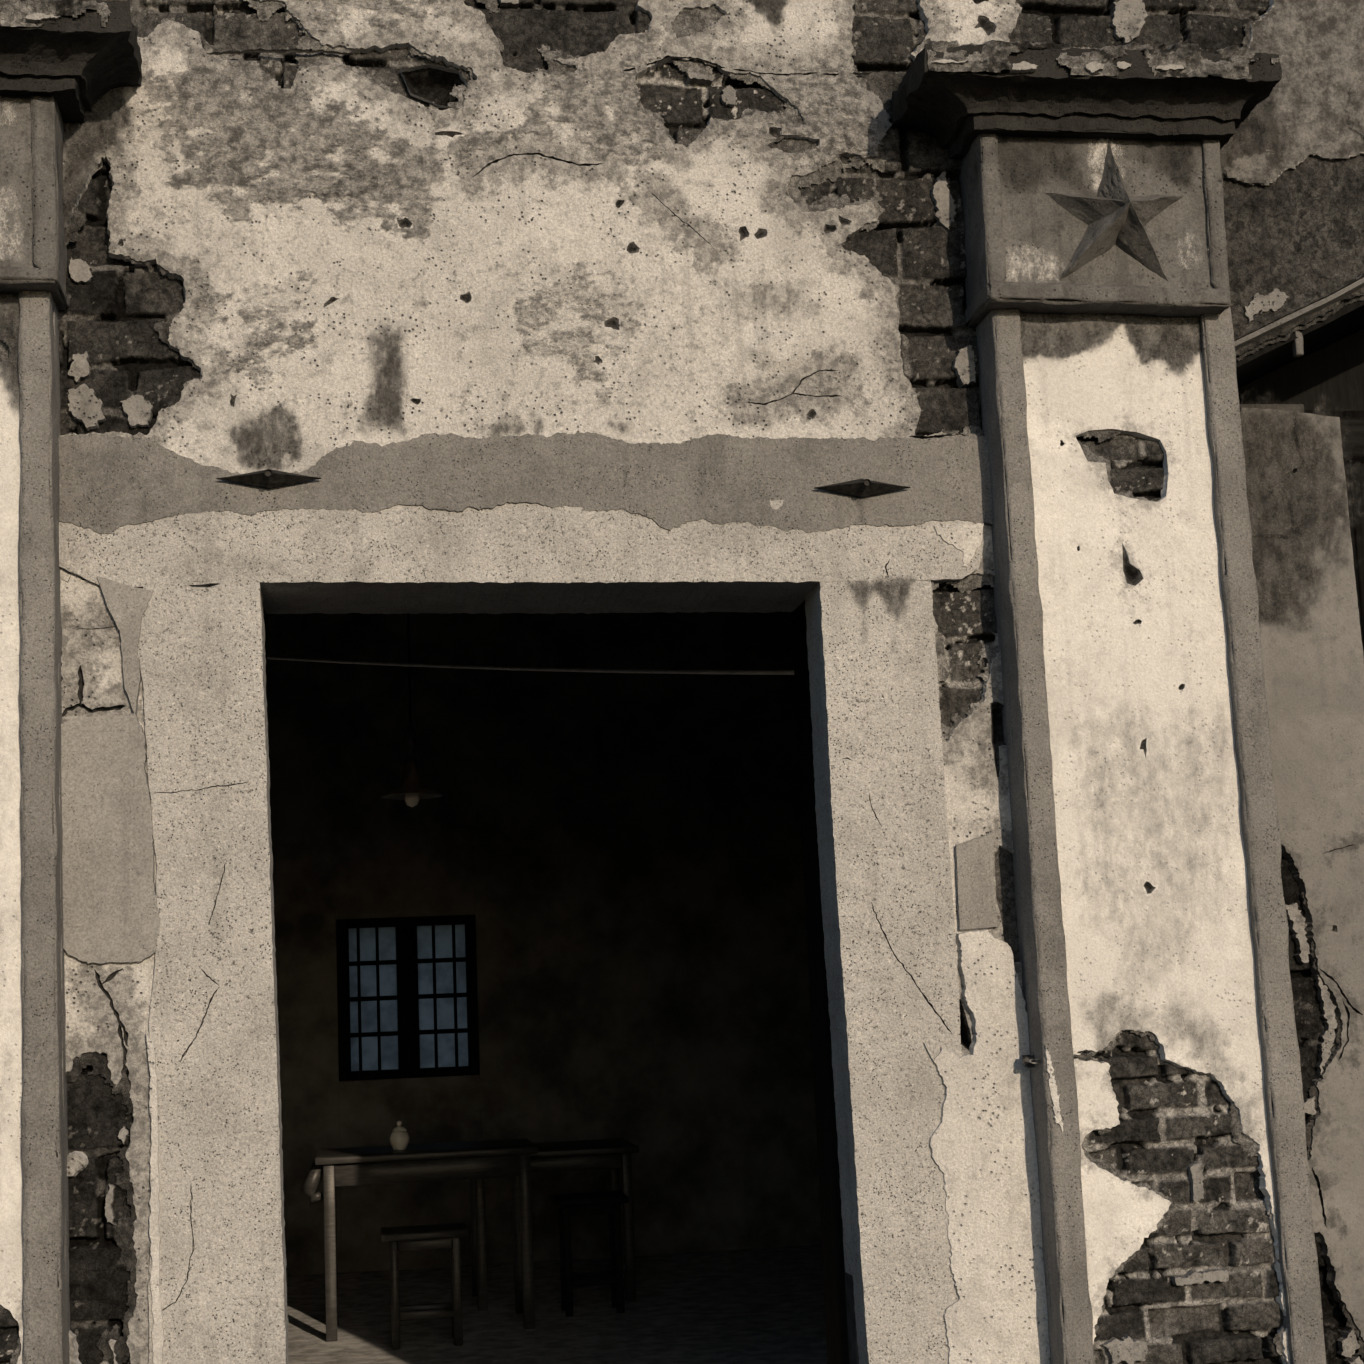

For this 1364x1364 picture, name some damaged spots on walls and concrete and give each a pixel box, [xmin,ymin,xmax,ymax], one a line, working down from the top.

peeling [0,0,477,110]
peeling [463,0,653,76]
peeling [58,151,203,435]
crack [471,153,602,178]
peeling [634,0,1279,437]
spalling [1060,429,1169,502]
peeling [932,573,1006,777]
crack [94,968,129,1069]
crack [871,902,953,1035]
peeling [1281,844,1344,1160]
peeling [66,1051,138,1364]
peeling [1074,1029,1289,1364]